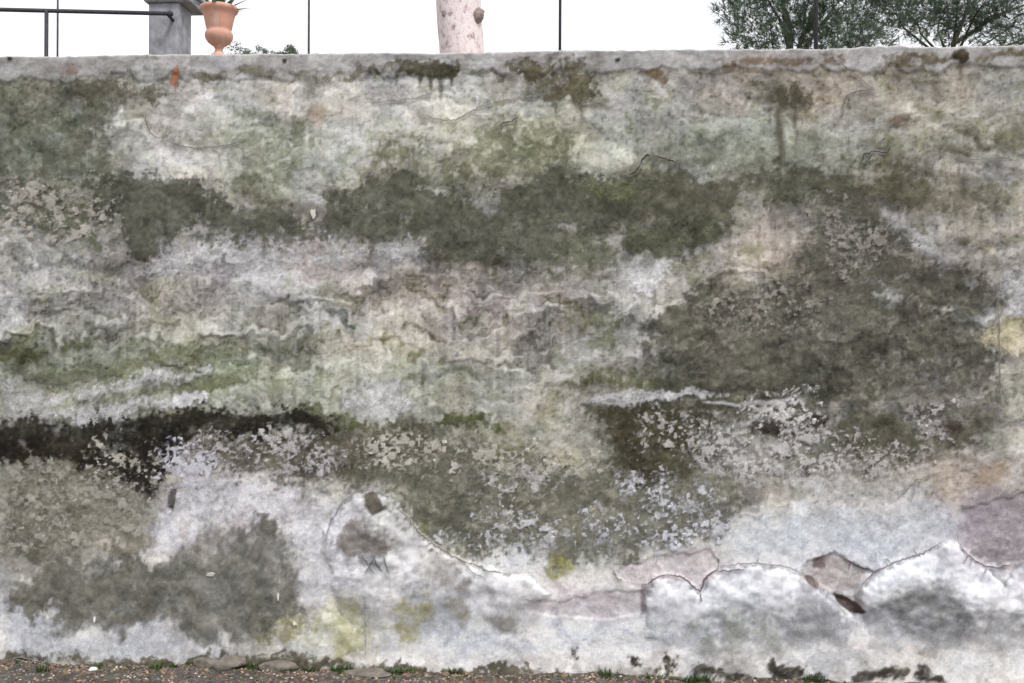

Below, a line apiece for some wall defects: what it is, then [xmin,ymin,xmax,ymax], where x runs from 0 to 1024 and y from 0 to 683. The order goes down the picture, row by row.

rust [170,66,179,85]
leakage [190,59,297,88]
leakage [309,59,461,99]
crack [628,154,681,176]
crack [859,138,897,166]
leakage [609,255,673,305]
flaking render [0,387,964,618]
crack [325,487,509,580]
crack [613,558,804,602]
crack [842,535,1012,587]